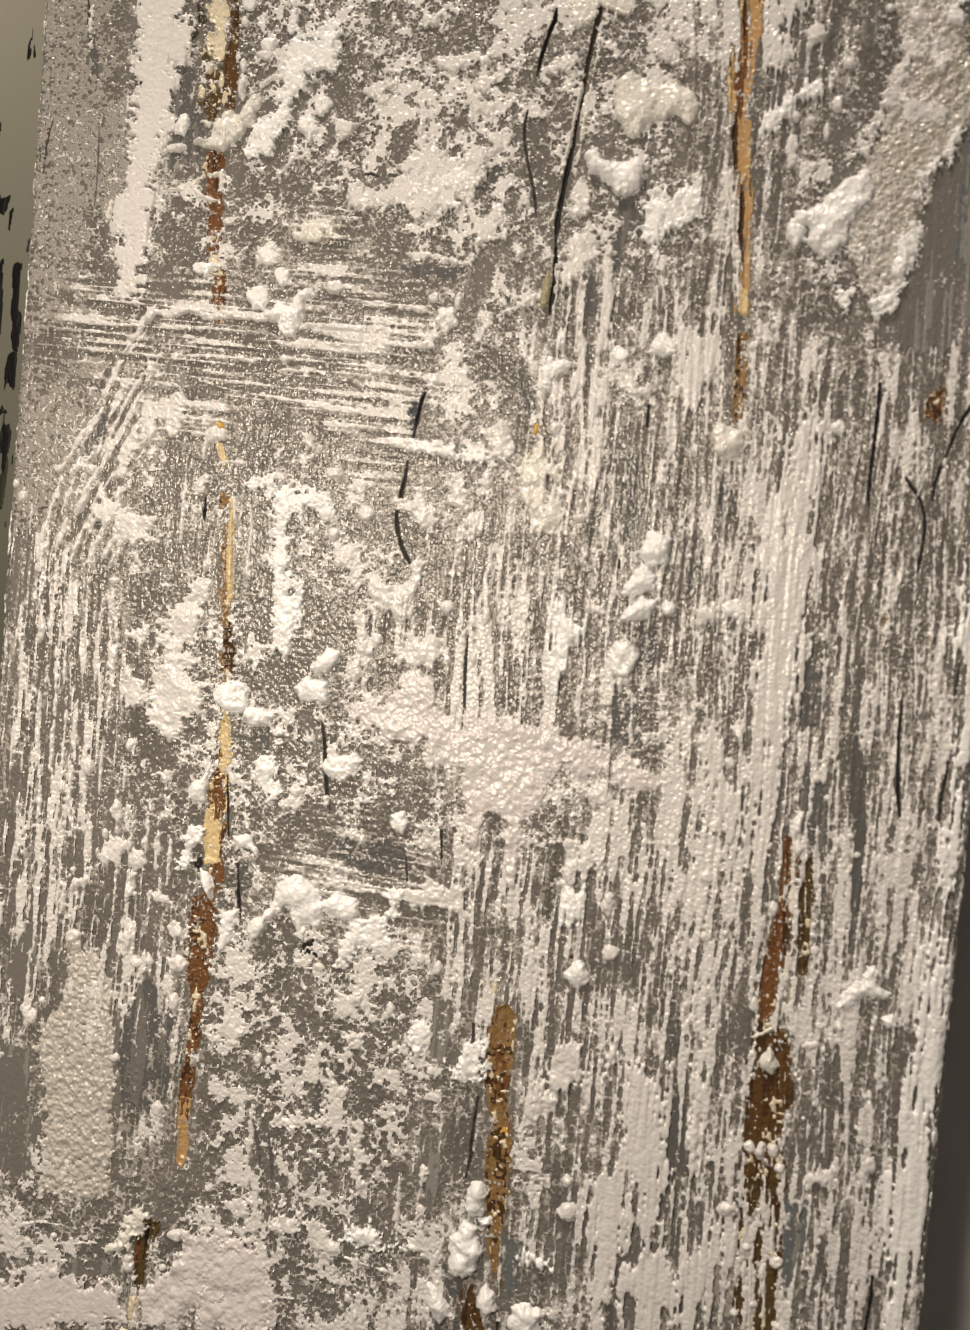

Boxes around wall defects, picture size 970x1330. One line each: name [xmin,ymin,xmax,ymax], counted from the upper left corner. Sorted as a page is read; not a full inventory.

crack [523,5,603,315]
rust [732,332,750,423]
rust [217,491,235,683]
rust [178,747,228,1120]
rust [483,1004,518,1287]